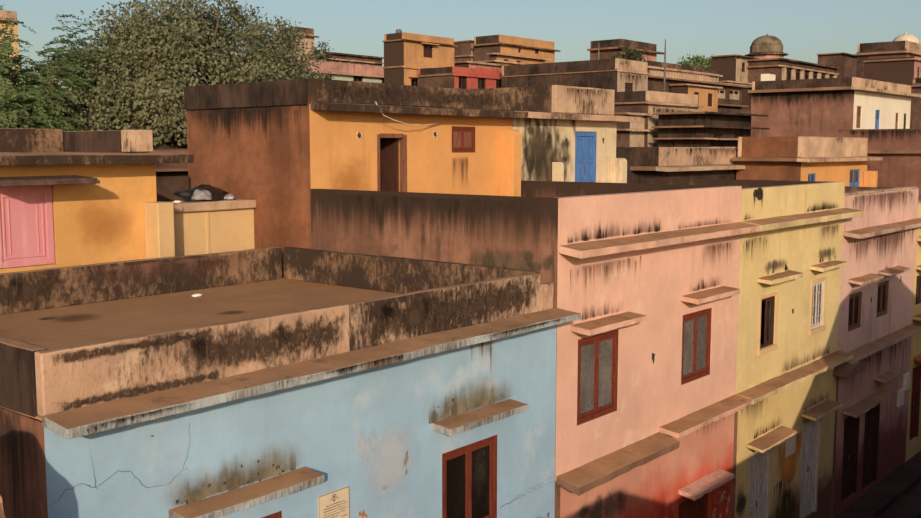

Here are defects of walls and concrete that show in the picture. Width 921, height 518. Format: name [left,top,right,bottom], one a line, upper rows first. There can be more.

water stain [329,84,502,107]
water stain [523,110,569,181]
water stain [568,226,660,243]
water stain [55,315,343,411]
water stain [429,390,501,423]
crack [51,425,190,505]
water stain [176,458,296,504]